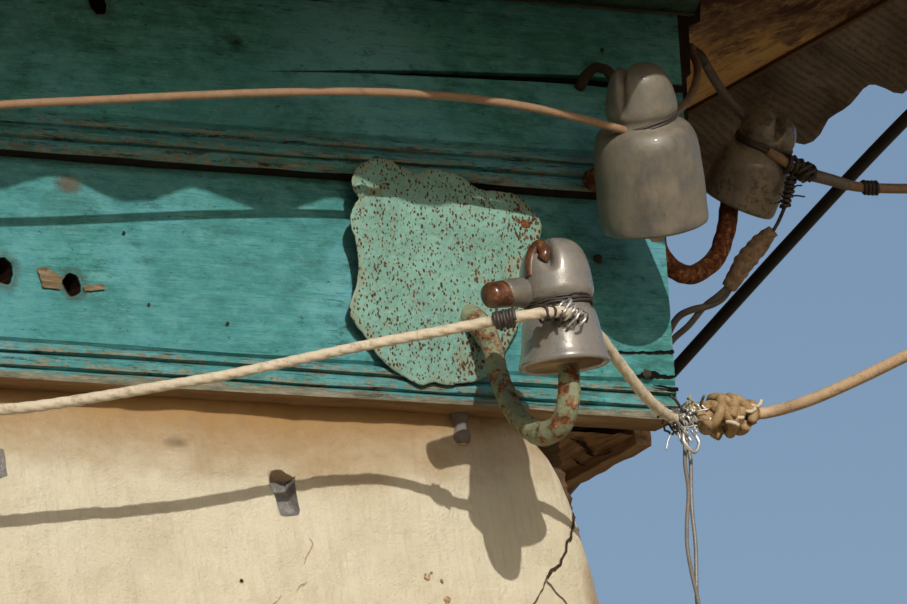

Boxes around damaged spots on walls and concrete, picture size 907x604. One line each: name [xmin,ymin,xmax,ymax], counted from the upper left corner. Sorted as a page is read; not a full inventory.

crack [533,513,575,604]